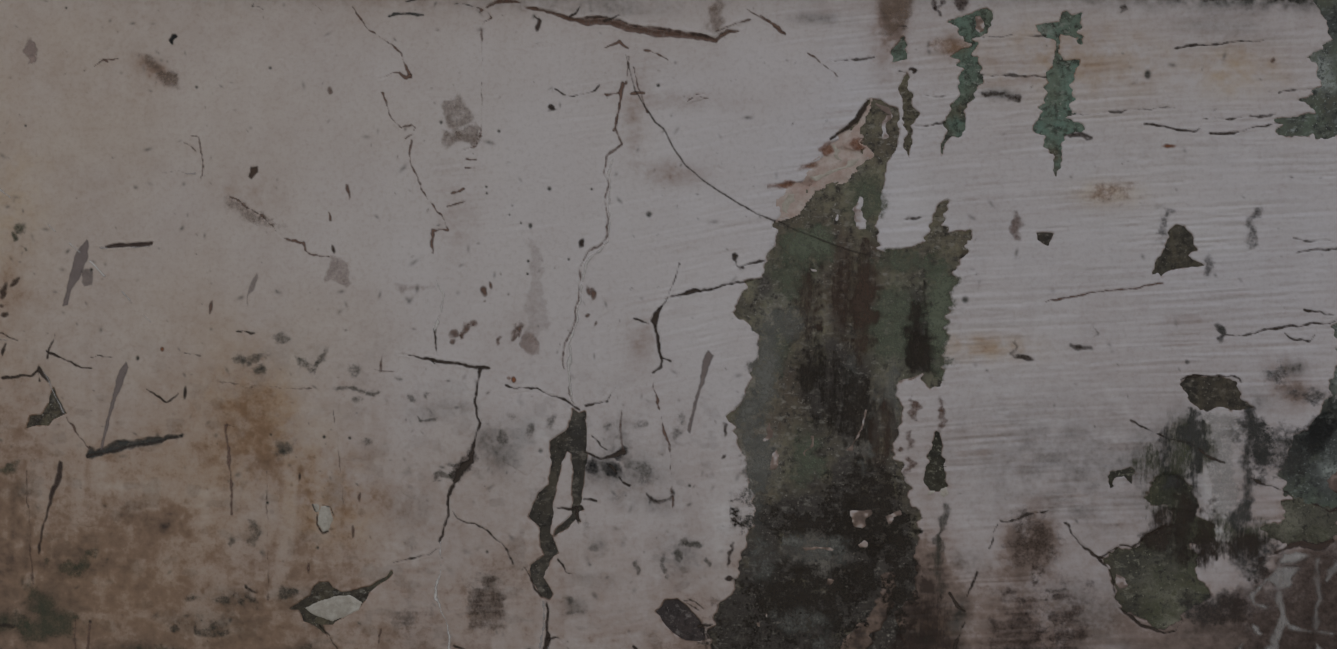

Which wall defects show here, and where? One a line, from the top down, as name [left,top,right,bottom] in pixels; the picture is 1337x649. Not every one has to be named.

peeling [941,8,1021,154]
peeling [1033,11,1085,176]
peeling [1274,0,1337,139]
crack [70,423,172,458]
crack [408,0,836,649]
peeling [656,37,972,649]
peeling [1152,225,1204,276]
peeling [1180,361,1253,412]
peeling [1260,323,1337,545]
peeling [290,564,393,634]
peeling [1102,474,1216,629]
water stain [1132,390,1337,649]